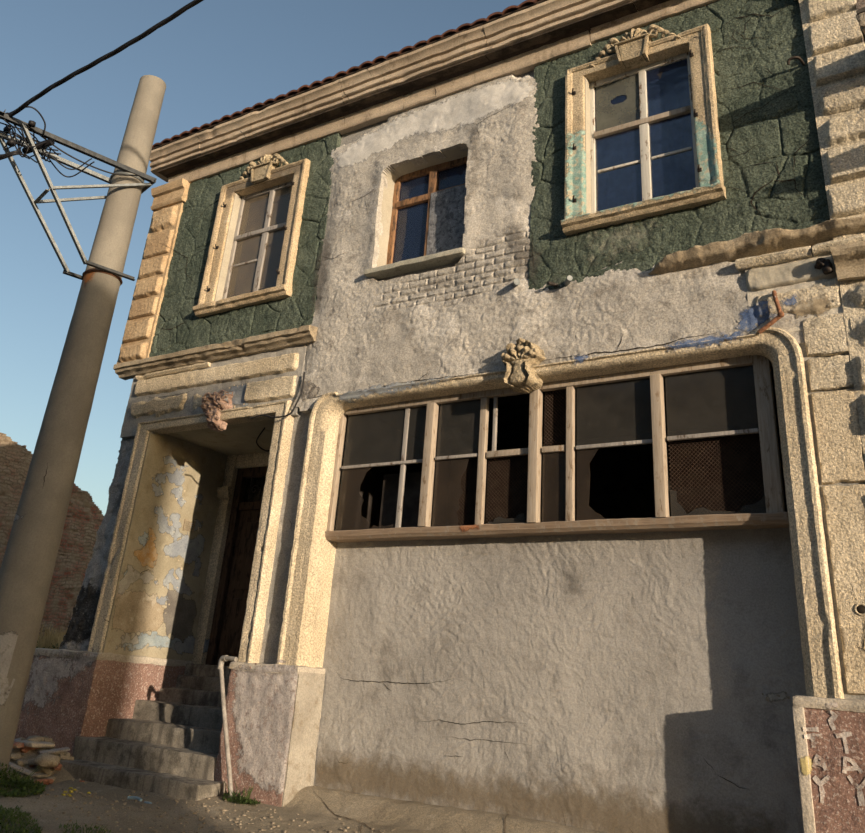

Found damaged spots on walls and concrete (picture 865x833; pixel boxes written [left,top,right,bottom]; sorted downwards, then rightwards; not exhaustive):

crack [690,5,788,53]
peeling [561,130,590,222]
peeling [601,117,720,212]
crack [722,137,813,229]
peeling [339,376,450,403]
spalling [112,455,209,655]
crack [337,673,453,690]
crack [422,720,526,758]